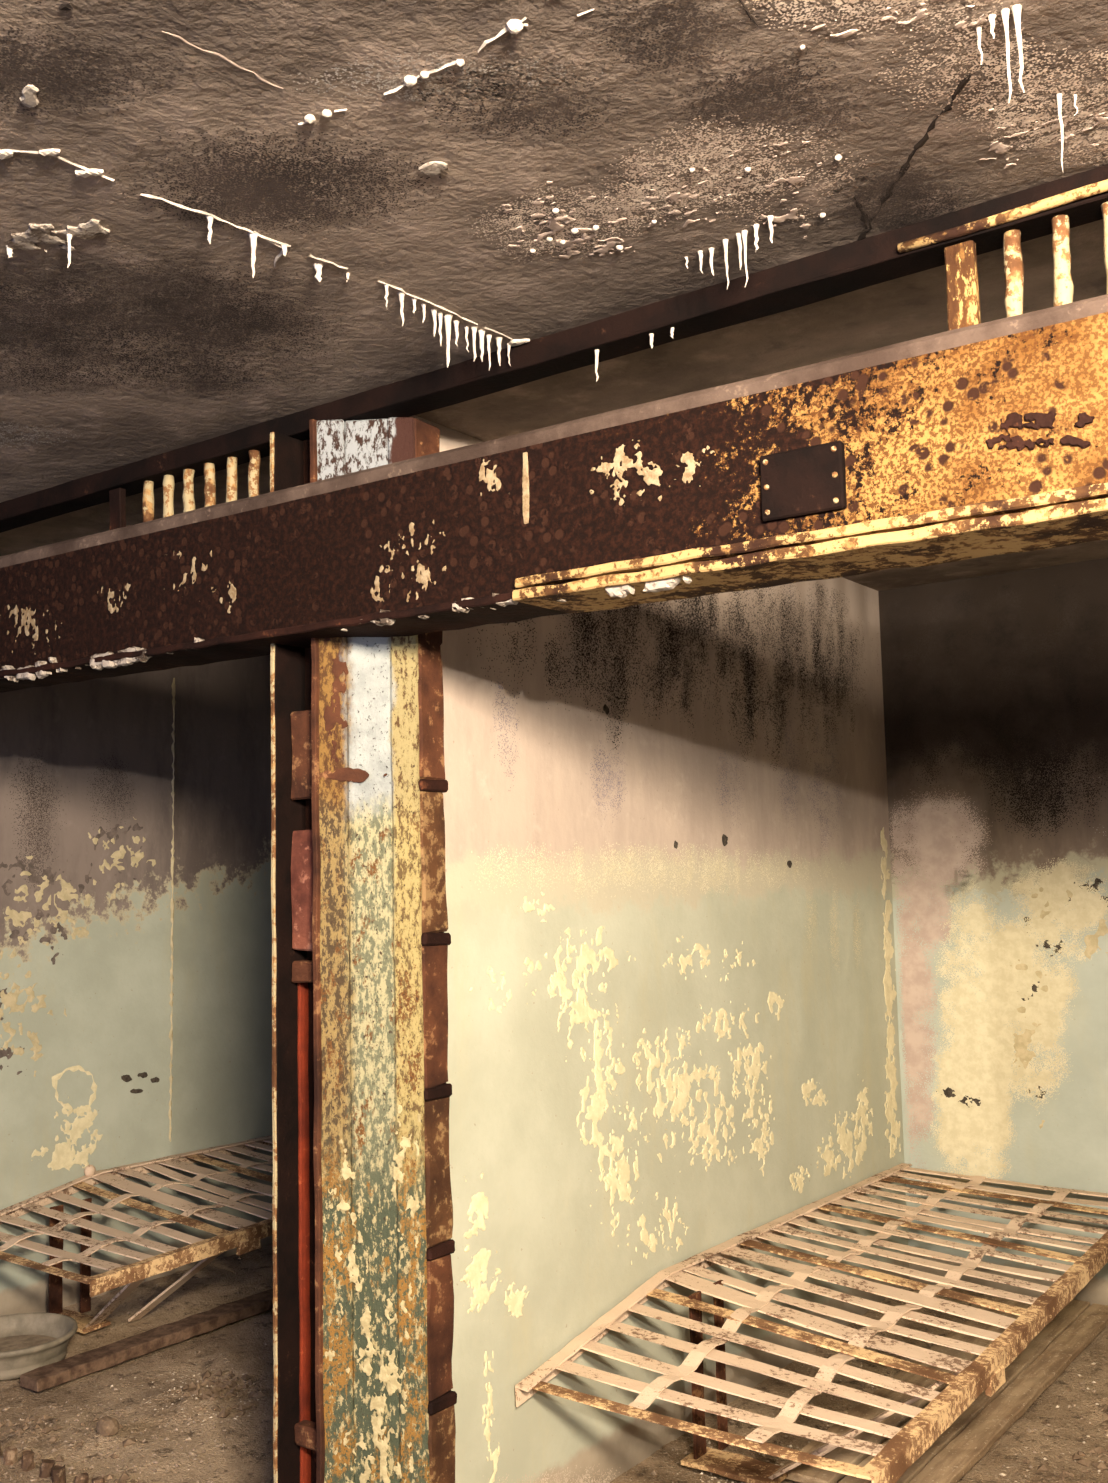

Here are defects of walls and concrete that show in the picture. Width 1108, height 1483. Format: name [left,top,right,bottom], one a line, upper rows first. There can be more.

damp [39,148,60,156]
damp [75,0,1108,262]
crack [853,75,971,241]
damp [0,219,373,403]
rust [986,411,1098,451]
rust [0,637,204,682]
rust [319,658,387,783]
rust [605,576,692,598]
peeling [0,817,156,1077]
peeling [487,892,786,1265]
peeling [789,827,901,1193]
peeling [930,857,1108,1204]